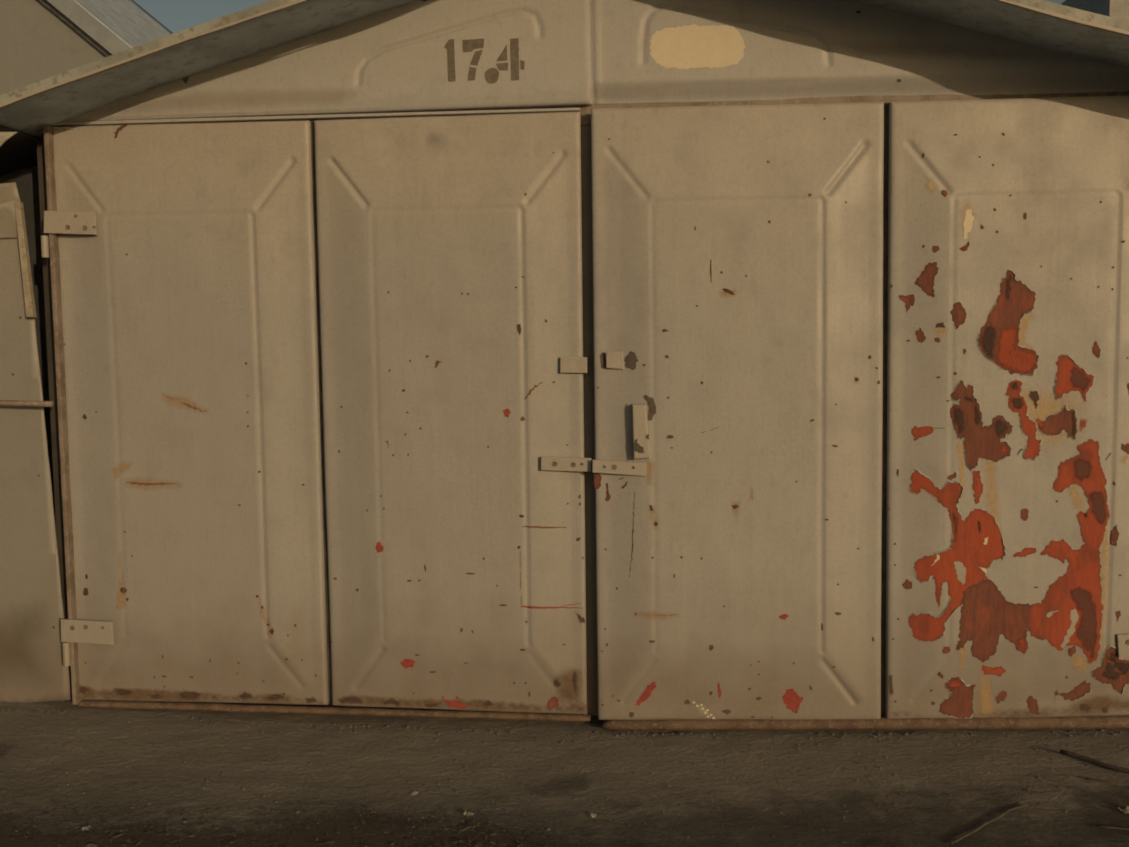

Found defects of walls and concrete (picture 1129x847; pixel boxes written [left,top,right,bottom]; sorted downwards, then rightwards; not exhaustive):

peeling [959,209,975,251]
peeling [899,246,940,313]
peeling [902,269,1129,718]
peeling [636,681,656,705]
peeling [782,688,804,713]